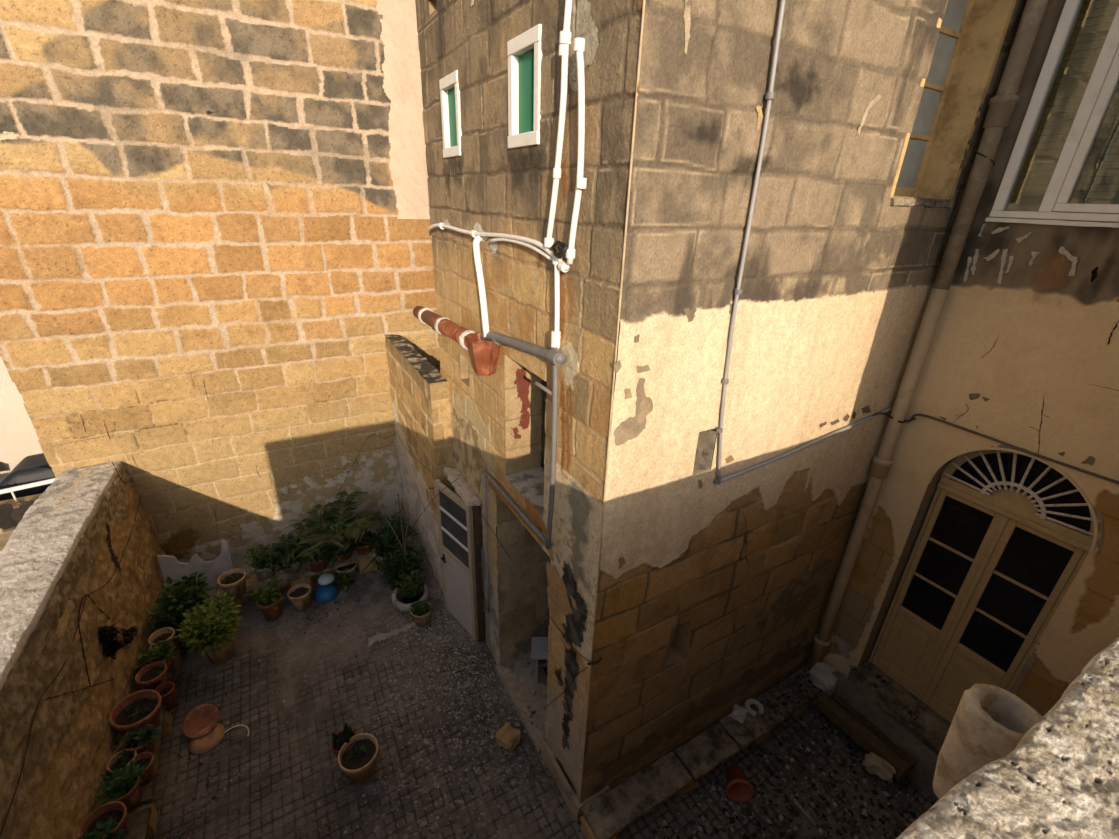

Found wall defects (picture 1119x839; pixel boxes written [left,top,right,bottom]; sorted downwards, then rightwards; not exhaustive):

leakage [782,70,817,106]
leakage [690,123,718,142]
leakage [737,159,768,172]
flaking render [684,308,697,322]